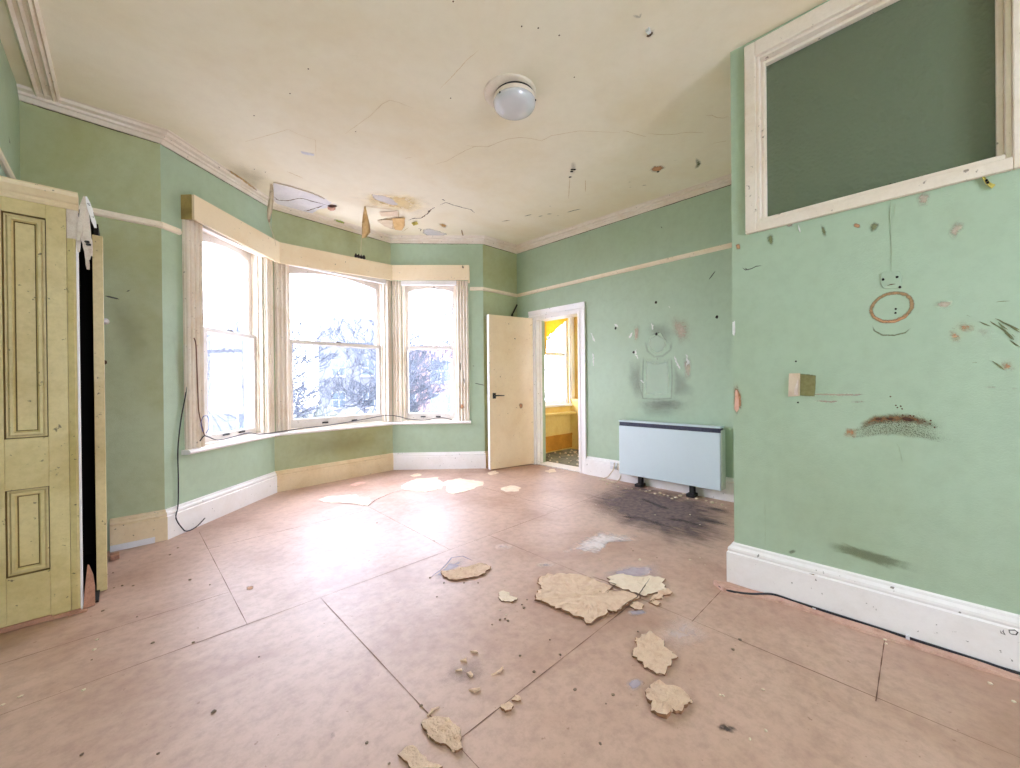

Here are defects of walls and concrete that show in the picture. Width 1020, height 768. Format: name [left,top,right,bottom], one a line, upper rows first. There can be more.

crack [24,102,475,244]
flaking render [267,182,337,222]
flaking render [362,195,445,238]